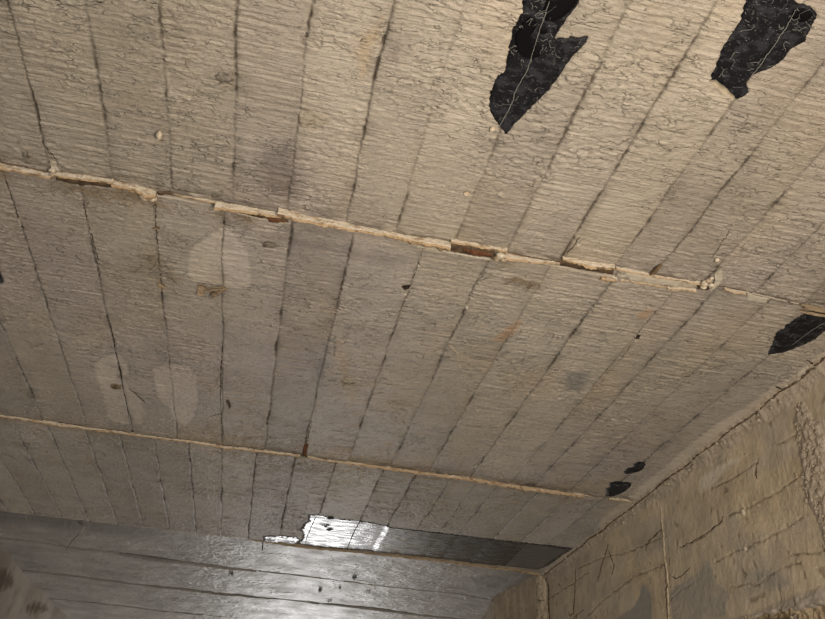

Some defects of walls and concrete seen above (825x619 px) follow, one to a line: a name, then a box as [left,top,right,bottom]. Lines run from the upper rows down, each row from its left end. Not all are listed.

peeling [489,0,588,134]
peeling [710,0,817,100]
crack [5,180,23,228]
crack [149,202,176,295]
crack [400,255,422,305]
peeling [768,307,825,358]
peeling [606,462,646,497]
crack [540,352,825,619]
peeling [262,514,573,619]